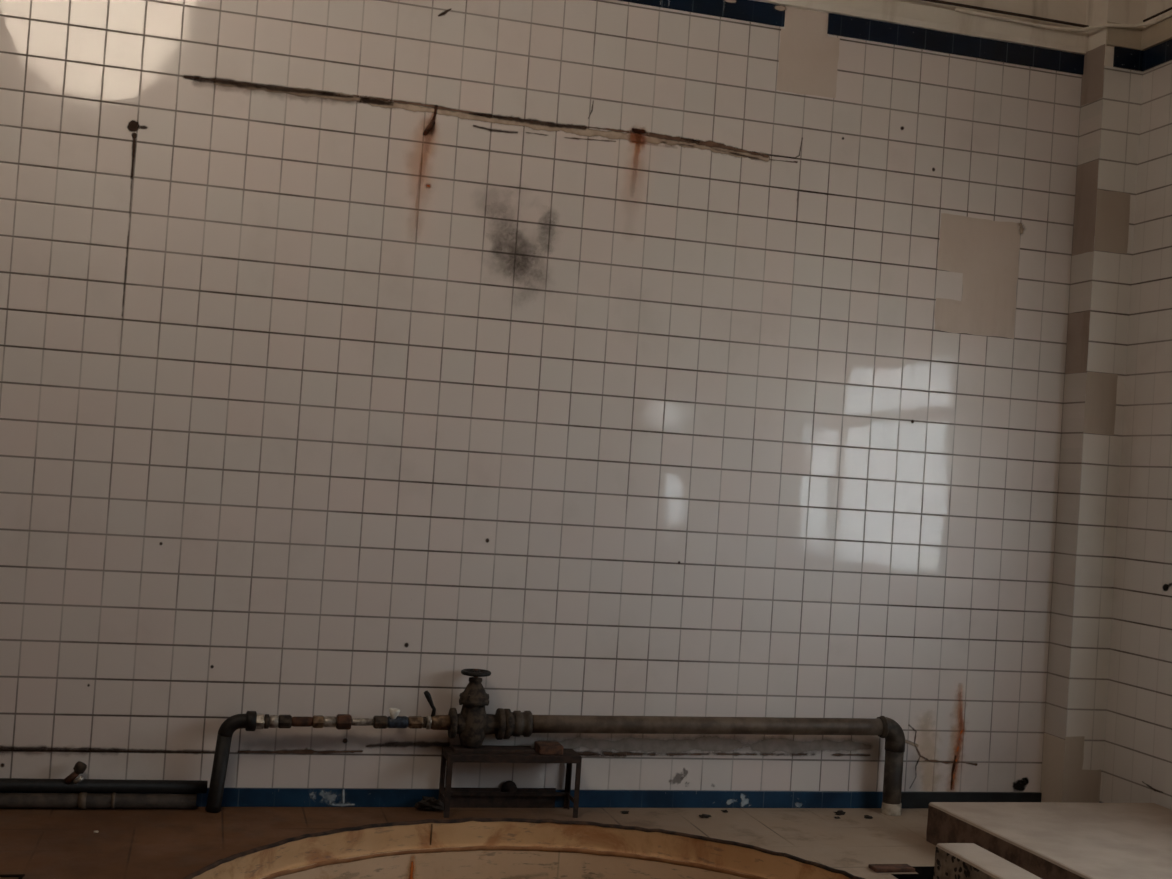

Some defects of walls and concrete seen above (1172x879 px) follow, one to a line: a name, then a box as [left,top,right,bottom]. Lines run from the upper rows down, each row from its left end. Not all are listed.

peeling [775,5,840,98]
crack [183,75,803,163]
crack [127,120,147,203]
crack [121,235,129,316]
damp [0,746,215,754]
rust [951,713,964,790]
crack [409,824,432,879]